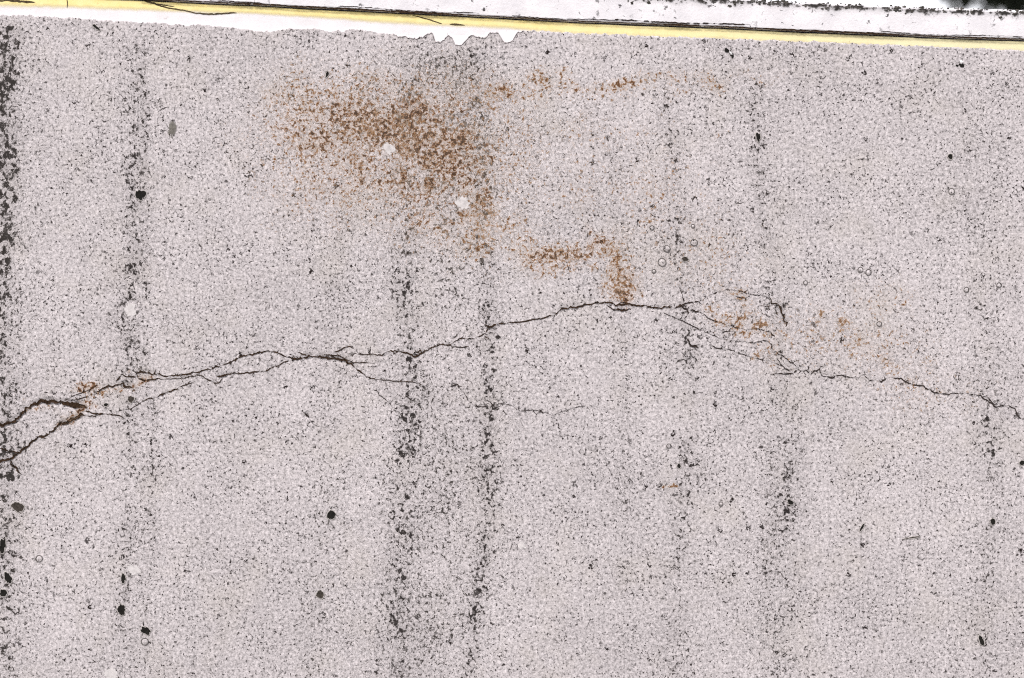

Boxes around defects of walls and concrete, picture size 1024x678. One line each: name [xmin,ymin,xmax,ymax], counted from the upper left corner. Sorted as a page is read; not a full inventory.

corrosion [242,62,730,309]
crack [0,288,1024,474]